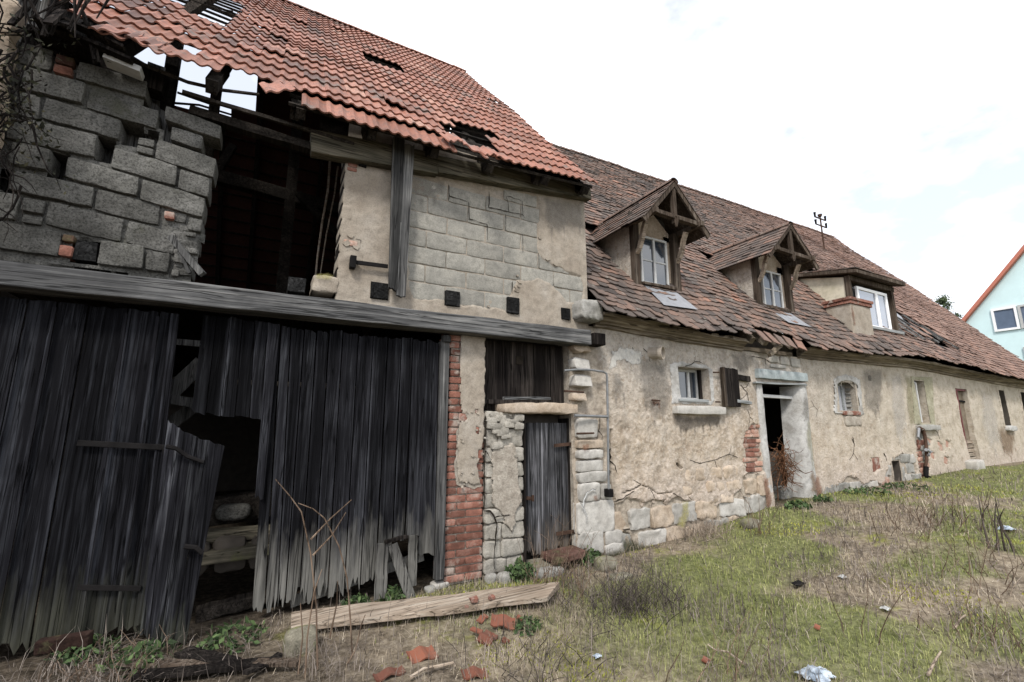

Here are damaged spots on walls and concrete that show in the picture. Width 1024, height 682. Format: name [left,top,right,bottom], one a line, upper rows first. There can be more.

flaking render [408,177,583,311]
spalling [454,410,524,489]
crack [597,425,684,534]
flaking render [614,421,771,546]